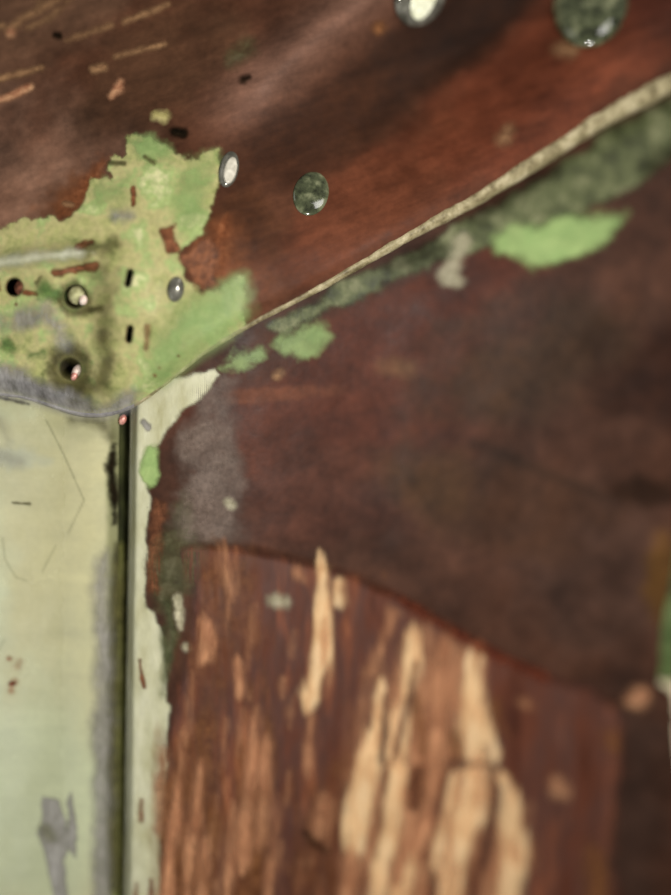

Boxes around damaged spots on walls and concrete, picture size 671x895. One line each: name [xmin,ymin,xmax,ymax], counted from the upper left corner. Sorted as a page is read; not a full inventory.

spalling [153,113,188,138]
peeling [0,134,623,895]
peeling [625,687,651,708]